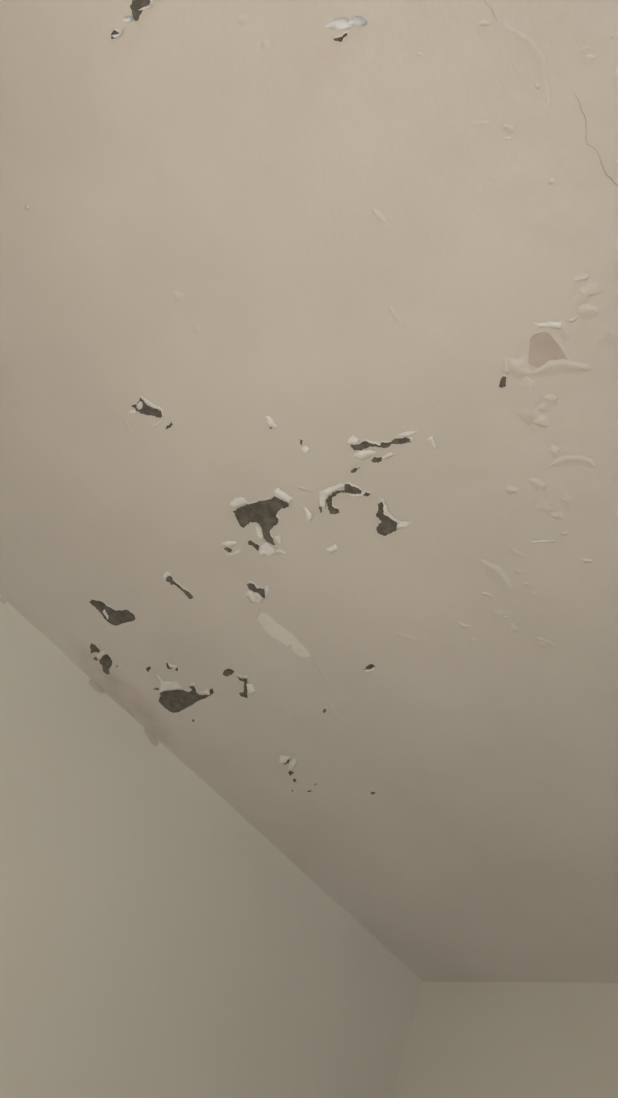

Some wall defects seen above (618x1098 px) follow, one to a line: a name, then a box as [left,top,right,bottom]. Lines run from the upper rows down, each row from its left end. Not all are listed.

peeling [109,0,154,41]
peeling [326,17,367,44]
crack [574,94,618,186]
peeling [124,395,175,430]
peeling [222,431,437,557]
peeling [163,572,196,600]
peeling [88,598,137,626]
peeling [146,661,215,722]
peeling [222,667,256,699]